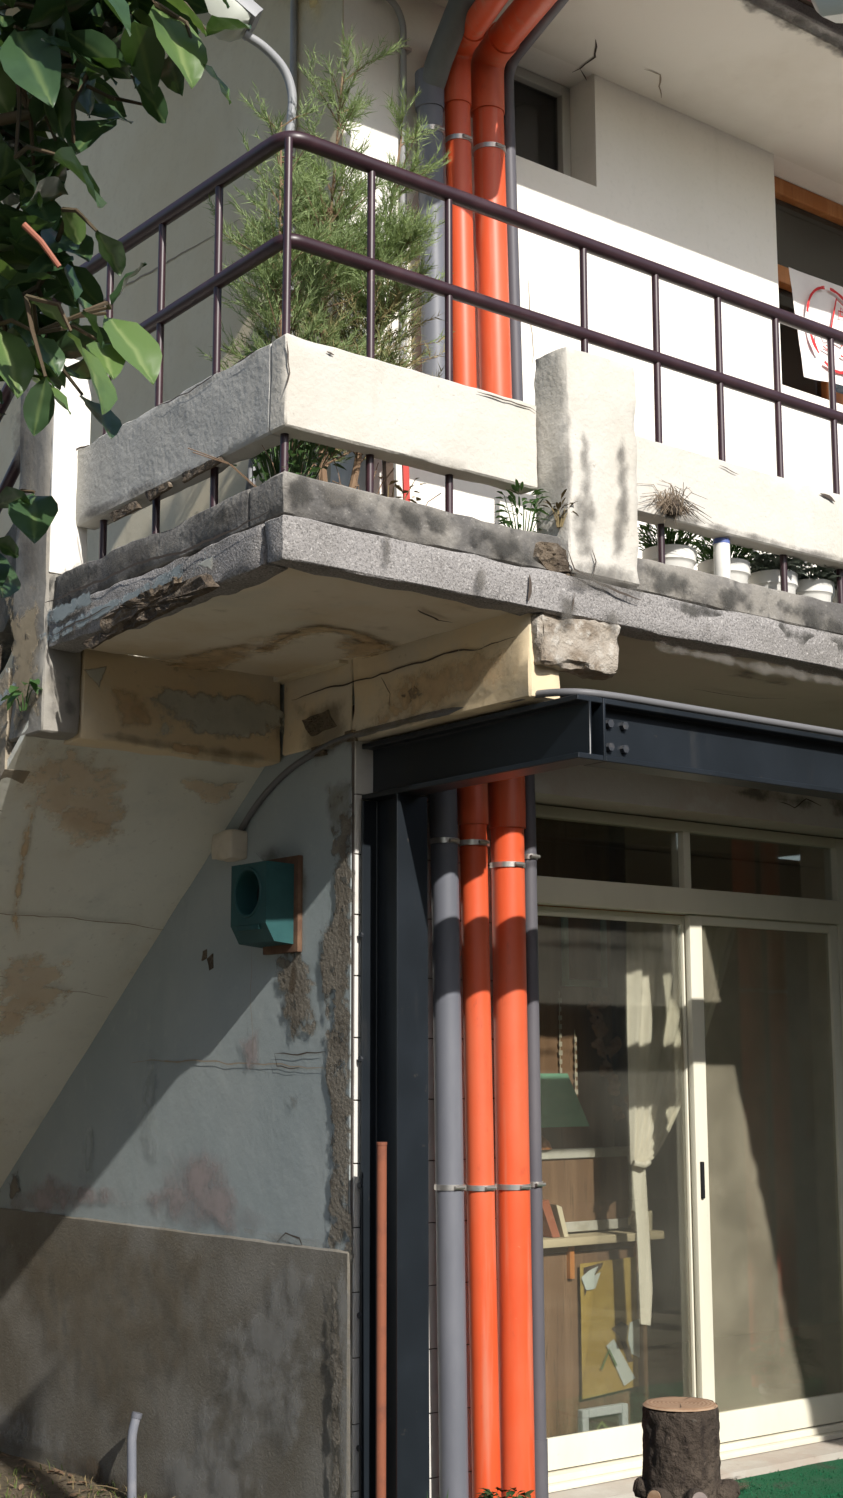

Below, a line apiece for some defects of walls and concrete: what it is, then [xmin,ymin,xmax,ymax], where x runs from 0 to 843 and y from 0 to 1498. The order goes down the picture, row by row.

water stain [290,480,357,504]
water stain [392,503,446,529]
water stain [566,444,594,550]
water stain [617,447,628,549]
crack [526,574,534,601]
water stain [565,567,632,623]
crack [568,550,640,611]
spalling [0,557,220,733]
crack [295,610,513,704]
spalling [302,710,358,757]
crack [131,954,326,1069]
flaking render [320,790,355,1498]